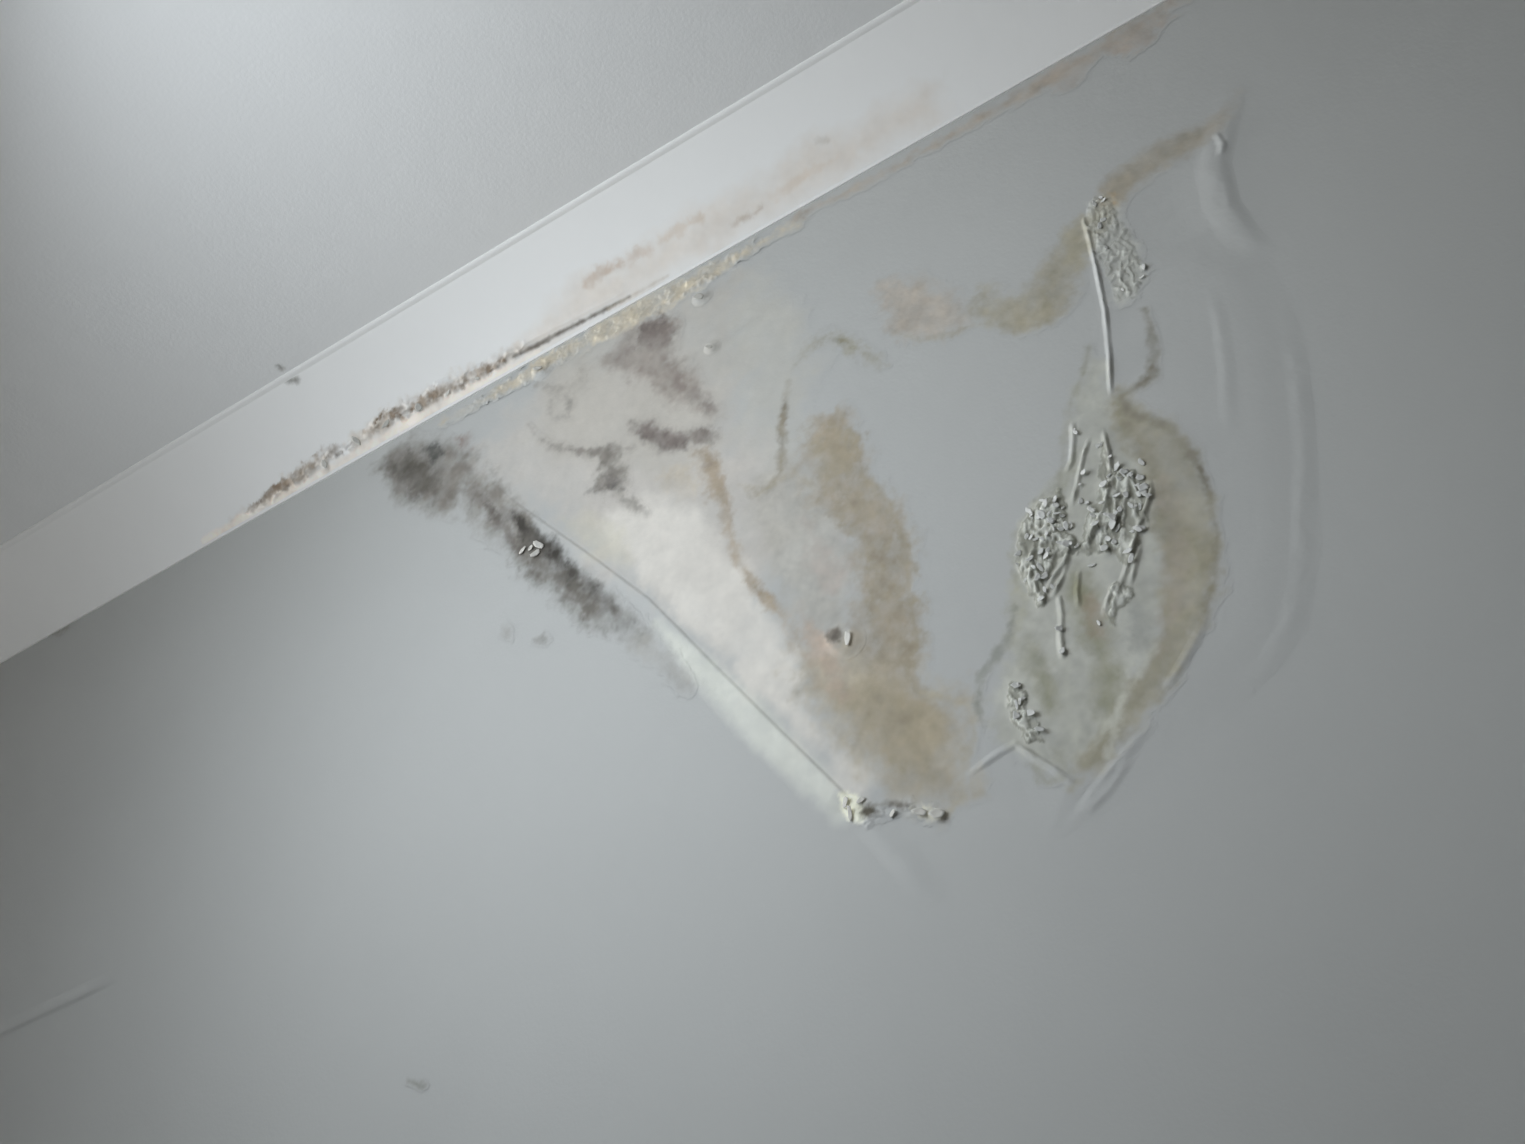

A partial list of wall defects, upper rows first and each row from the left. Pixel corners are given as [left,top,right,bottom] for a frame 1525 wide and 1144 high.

peeling [1077,191,1154,360]
peeling [200,338,543,545]
water stain [365,0,1250,835]
peeling [1010,428,1162,610]
peeling [983,674,1054,767]